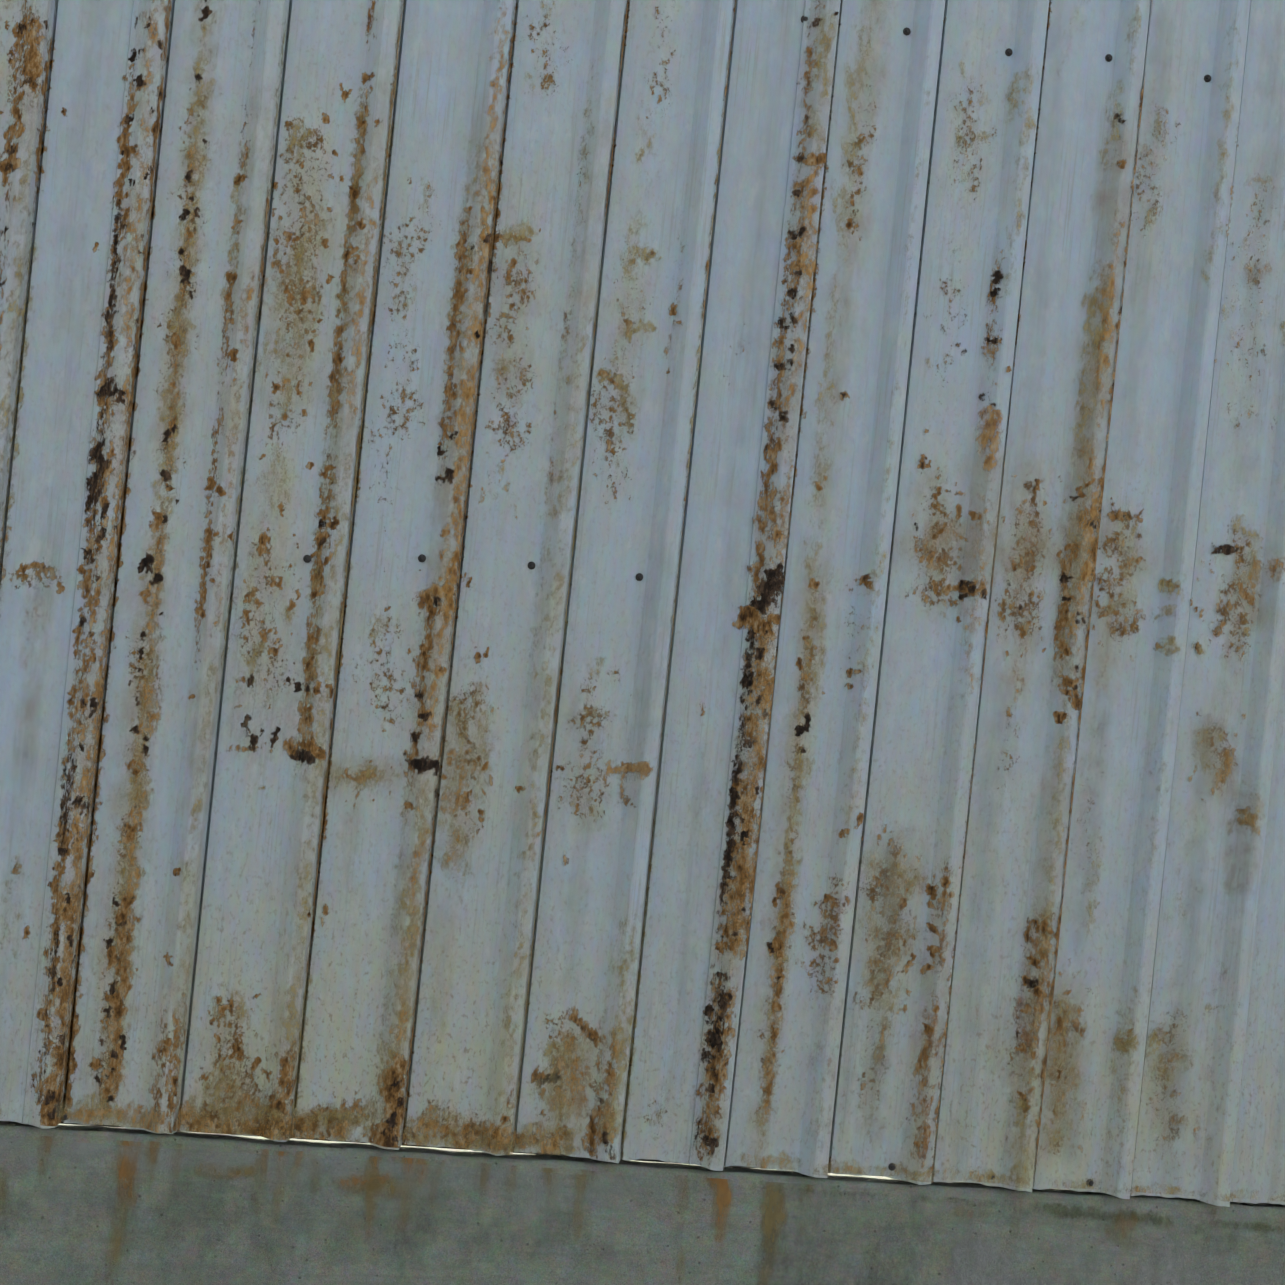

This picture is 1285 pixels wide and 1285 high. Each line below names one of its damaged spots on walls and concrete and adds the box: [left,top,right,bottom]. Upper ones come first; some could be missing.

corrosion [0,0,664,1218]
corrosion [650,7,676,104]
corrosion [664,285,682,373]
corrosion [695,4,877,1161]
corrosion [753,545,968,1181]
corrosion [905,78,1285,1186]